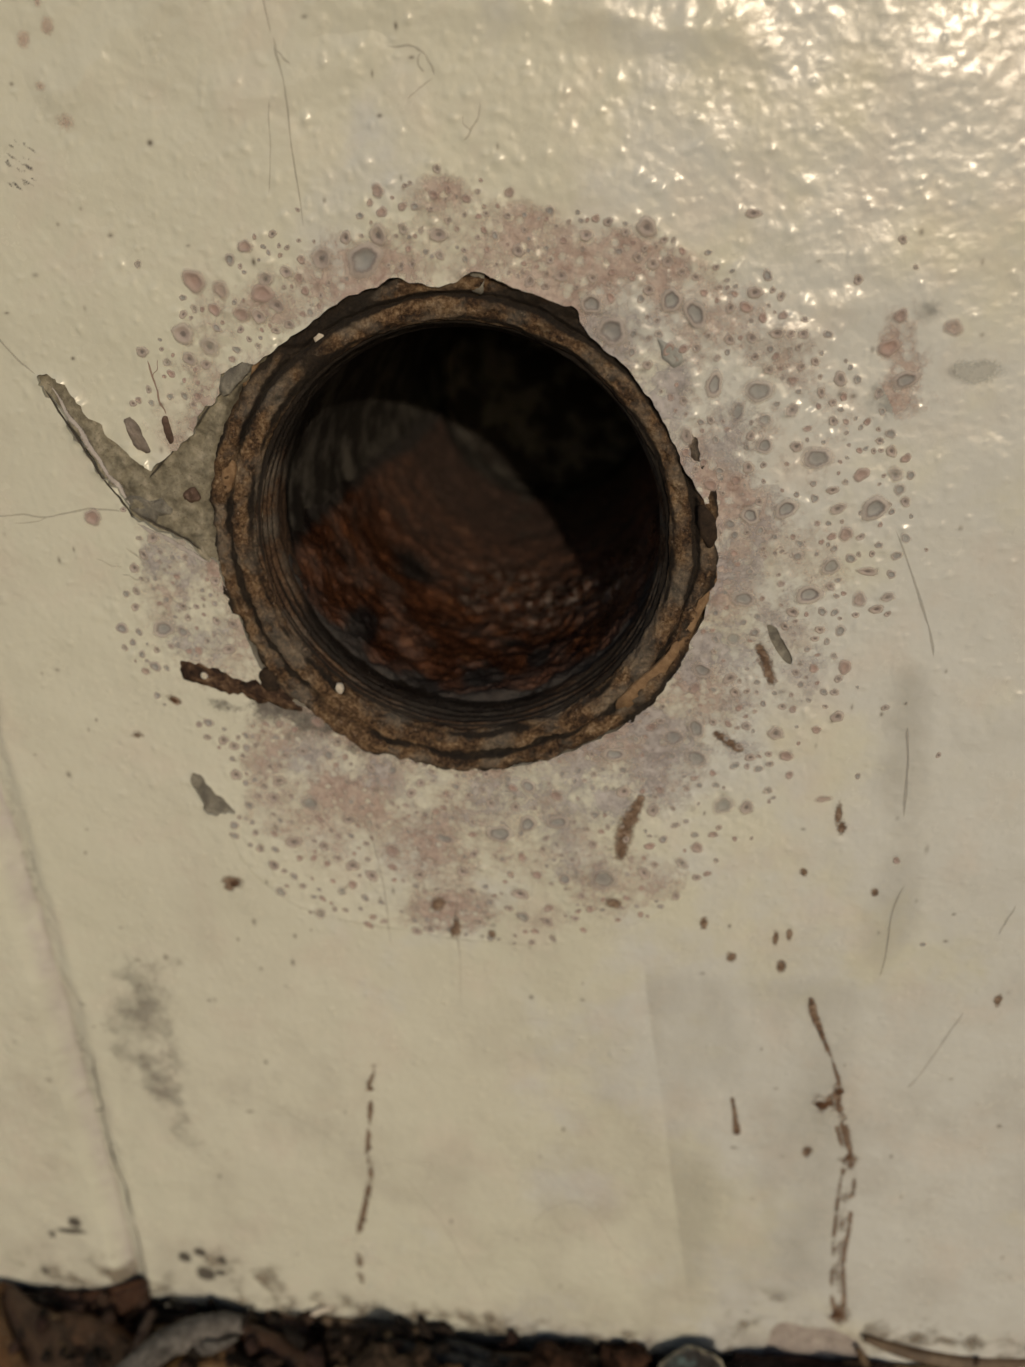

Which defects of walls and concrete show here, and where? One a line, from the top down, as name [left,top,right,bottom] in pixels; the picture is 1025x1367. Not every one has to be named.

corrosion [470,272,485,294]
peeling [39,355,268,562]
corrosion [289,404,660,701]
corrosion [698,505,717,548]
corrosion [615,571,717,709]
peeling [191,773,235,816]
corrosion [615,795,645,859]
corrosion [714,731,743,752]
corrosion [357,1073,374,1233]
corrosion [808,998,856,1323]